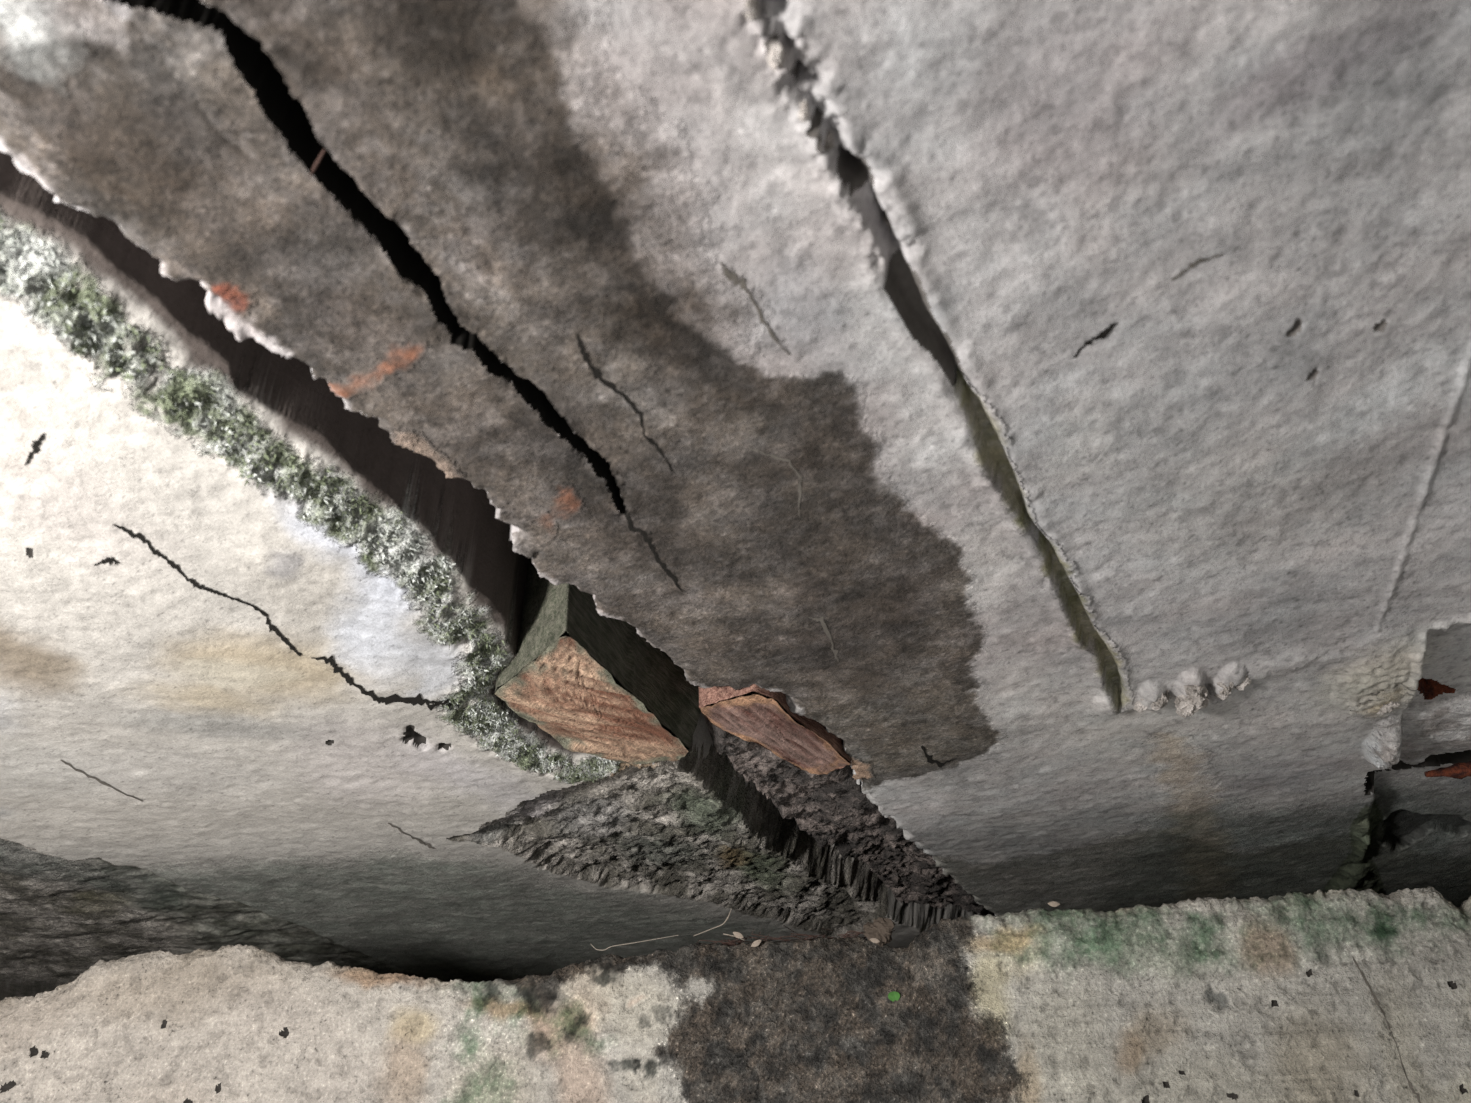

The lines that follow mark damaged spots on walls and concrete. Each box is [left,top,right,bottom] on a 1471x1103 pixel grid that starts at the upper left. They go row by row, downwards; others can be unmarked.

spalling [805,106,824,152]
crack [103,0,681,590]
crack [24,433,45,466]
spalling [388,429,466,479]
damp [0,0,1010,792]
crack [94,524,460,711]
spalling [402,725,451,750]
spalling [1363,672,1471,795]
spalling [446,736,889,939]
spalling [0,838,176,1001]
damp [477,978,507,1013]
damp [520,917,1034,1103]